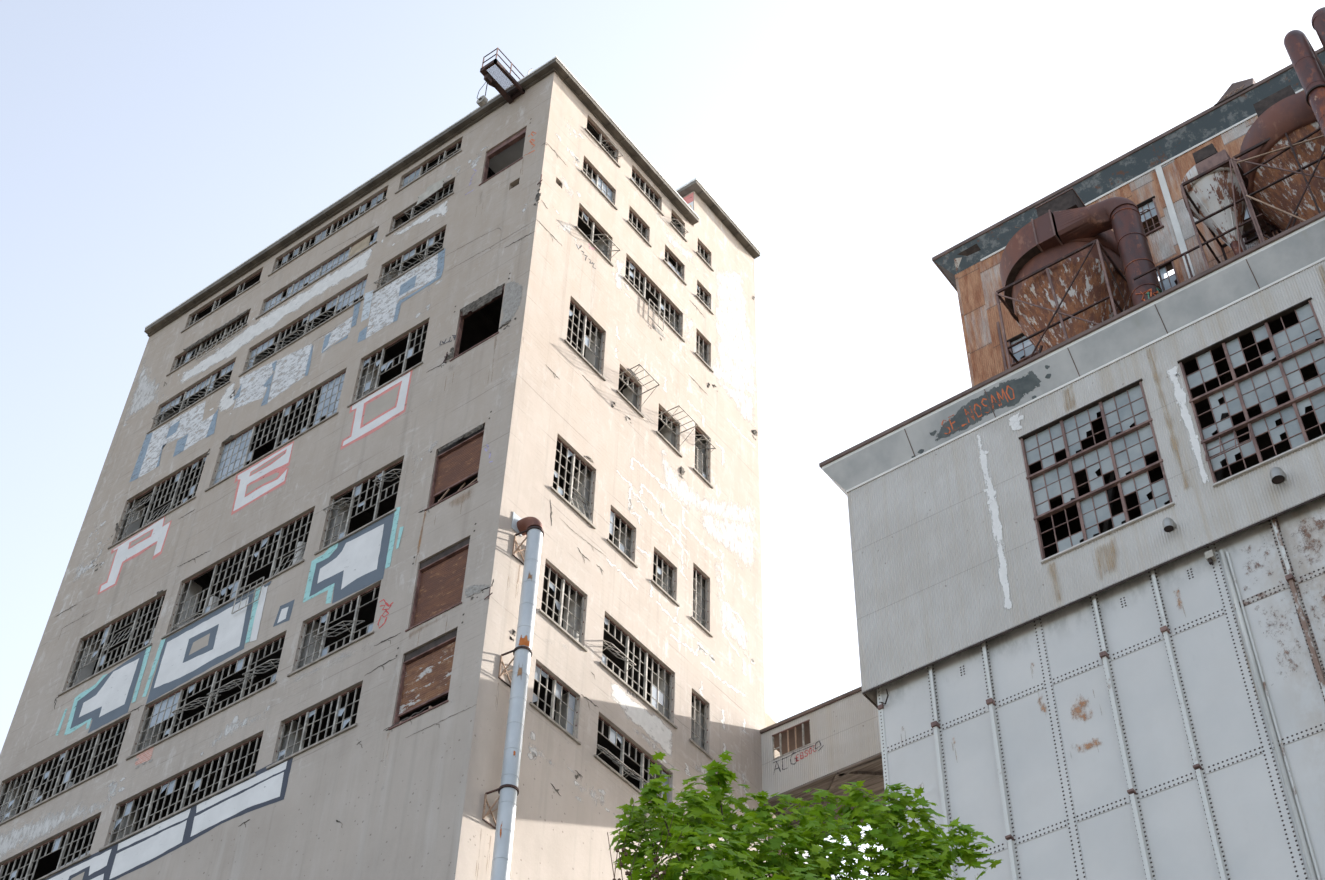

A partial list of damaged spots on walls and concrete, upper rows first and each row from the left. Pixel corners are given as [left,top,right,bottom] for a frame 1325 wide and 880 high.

corrosion [1293,520,1325,568]